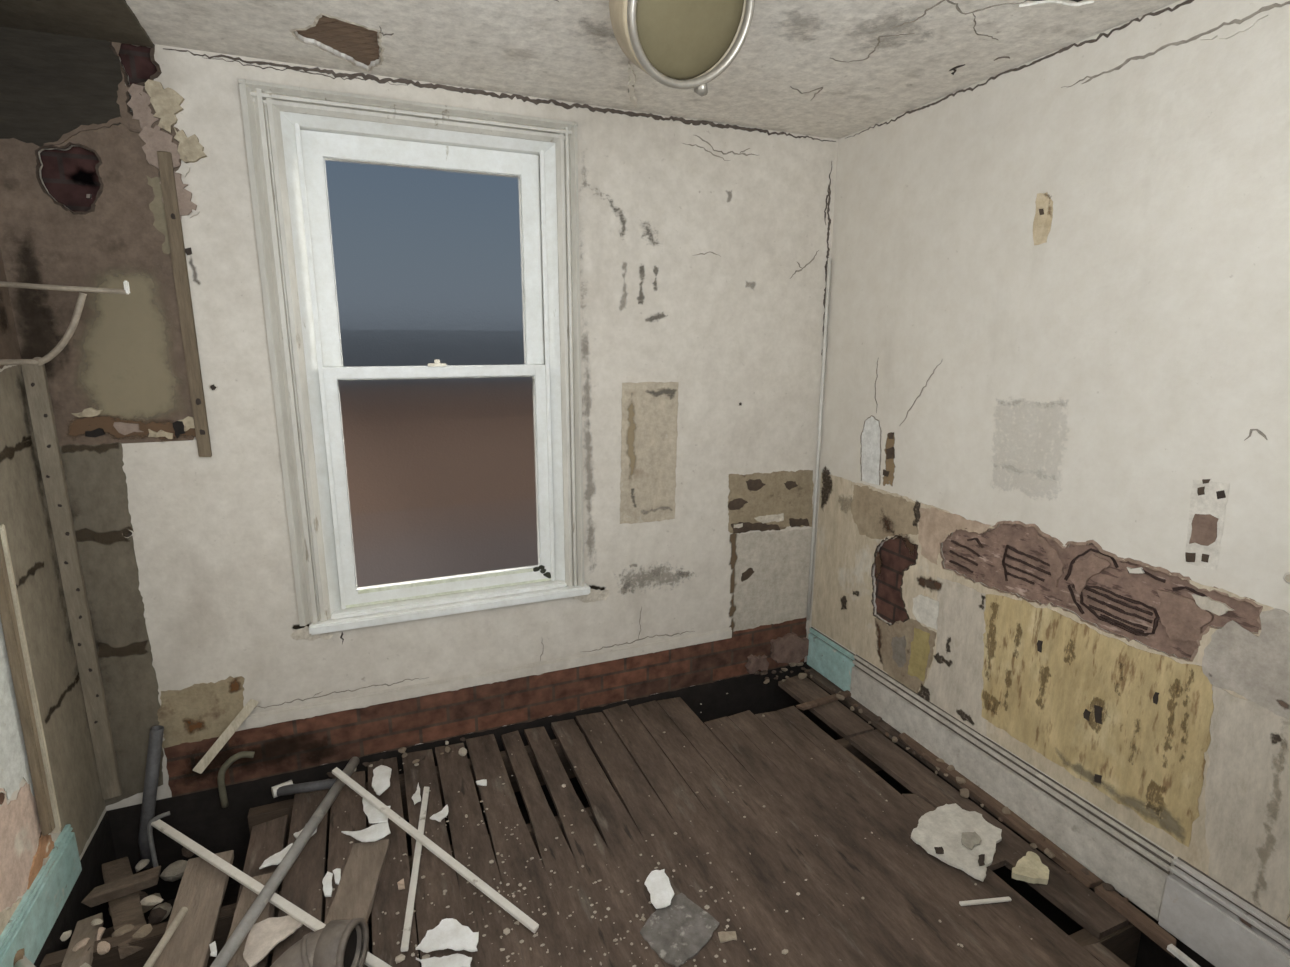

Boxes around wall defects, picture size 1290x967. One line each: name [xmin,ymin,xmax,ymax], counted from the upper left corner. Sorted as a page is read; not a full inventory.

crack [163,0,1290,355]
flaking render [0,0,812,857]
leakage [956,709,975,725]
leakage [979,594,1022,714]
leakage [1036,667,1051,709]
flaking render [811,472,1290,927]
leakage [1163,670,1194,767]
flaking render [0,618,54,935]
flaking render [259,825,317,869]
leakage [1067,763,1182,838]
flaking render [415,918,479,967]
spalling [640,869,737,967]